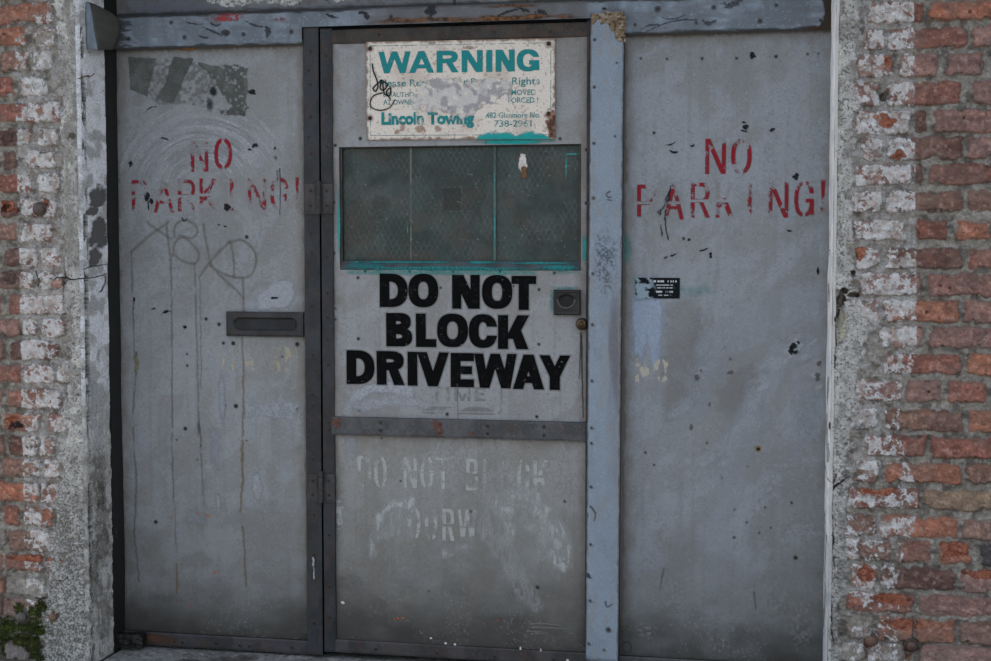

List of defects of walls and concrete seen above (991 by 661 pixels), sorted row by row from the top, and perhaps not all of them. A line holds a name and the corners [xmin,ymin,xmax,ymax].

corrosion [591,11,627,42]
peeling [836,1,923,661]